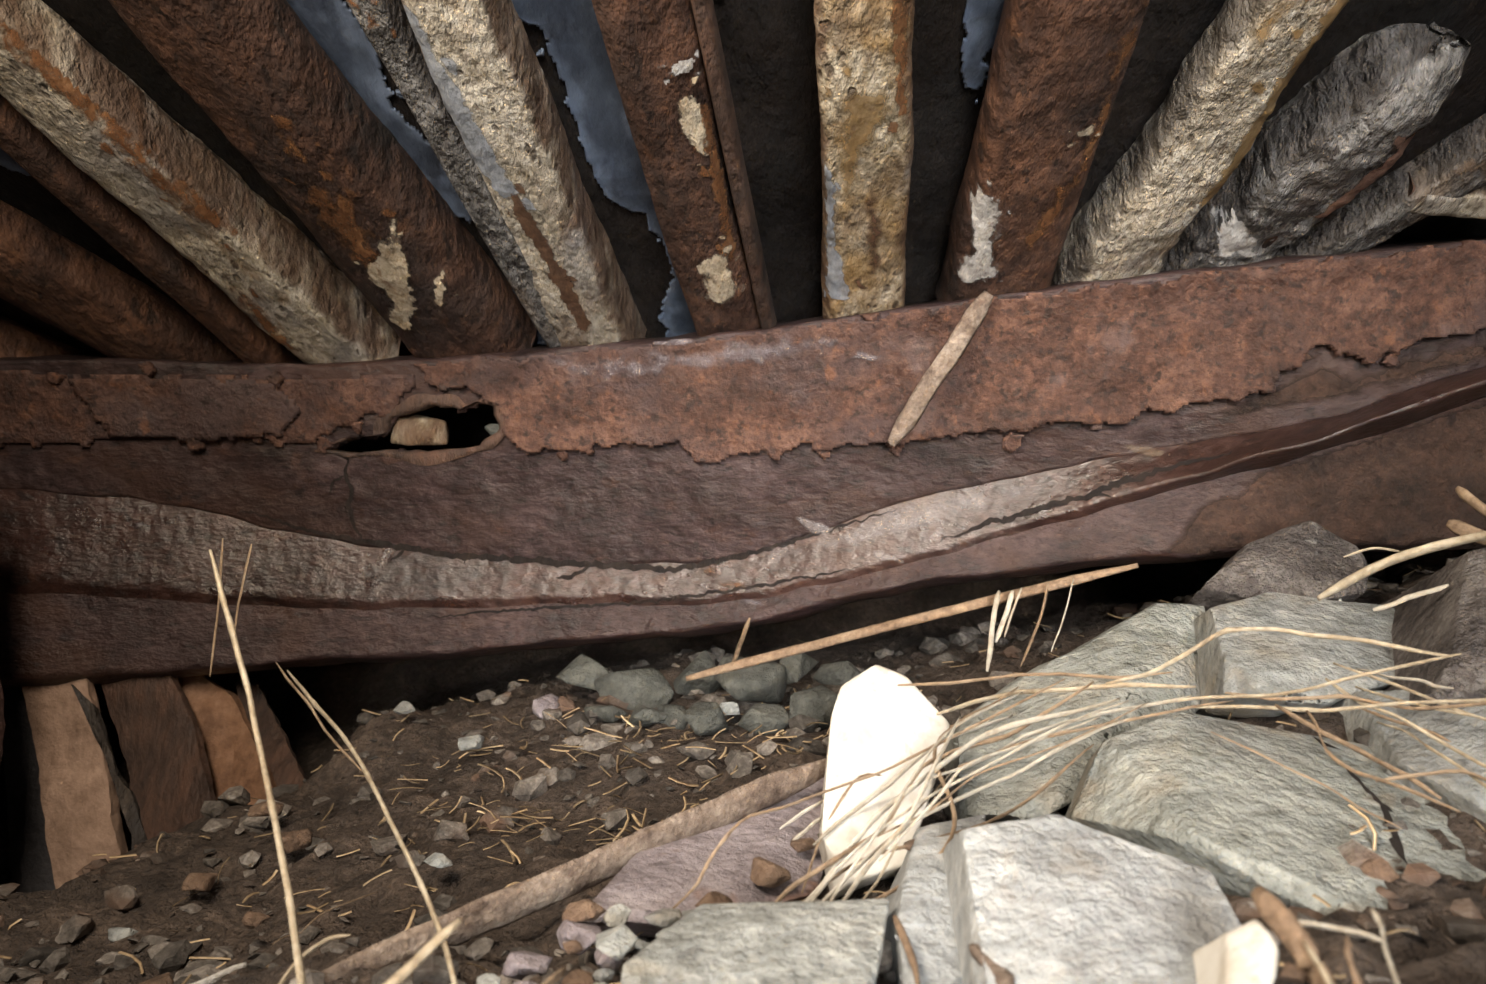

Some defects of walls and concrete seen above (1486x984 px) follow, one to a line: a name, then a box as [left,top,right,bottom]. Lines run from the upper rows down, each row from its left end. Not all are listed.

rust [0,23,238,252]
rust [271,115,320,162]
rust [283,171,380,267]
rust [508,183,592,332]
rust [698,104,742,278]
rust [825,0,908,189]
rust [855,197,896,289]
rust [1025,0,1146,248]
rust [0,239,1486,462]